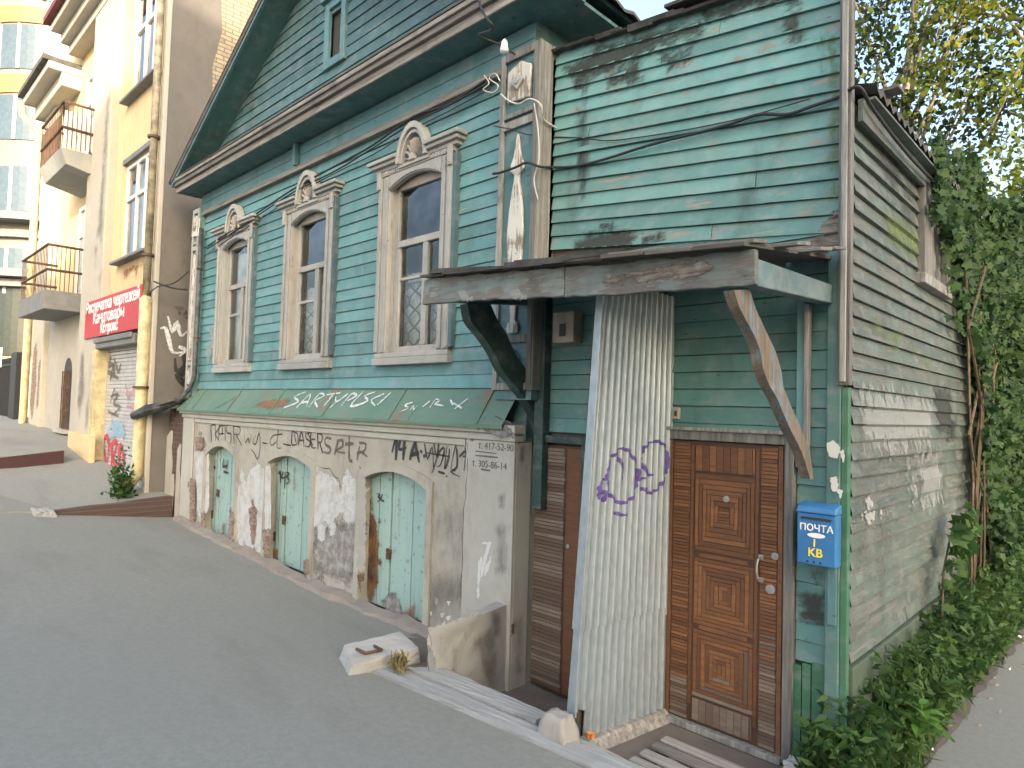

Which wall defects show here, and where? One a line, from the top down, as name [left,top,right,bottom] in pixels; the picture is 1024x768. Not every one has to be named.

damp [564,0,802,89]
damp [575,223,663,255]
peeling [603,259,714,286]
peeling [188,431,210,528]
peeling [228,461,273,557]
flaking render [303,466,369,583]
rust [367,499,382,603]
peeling [826,440,845,461]
peeling [830,476,843,498]